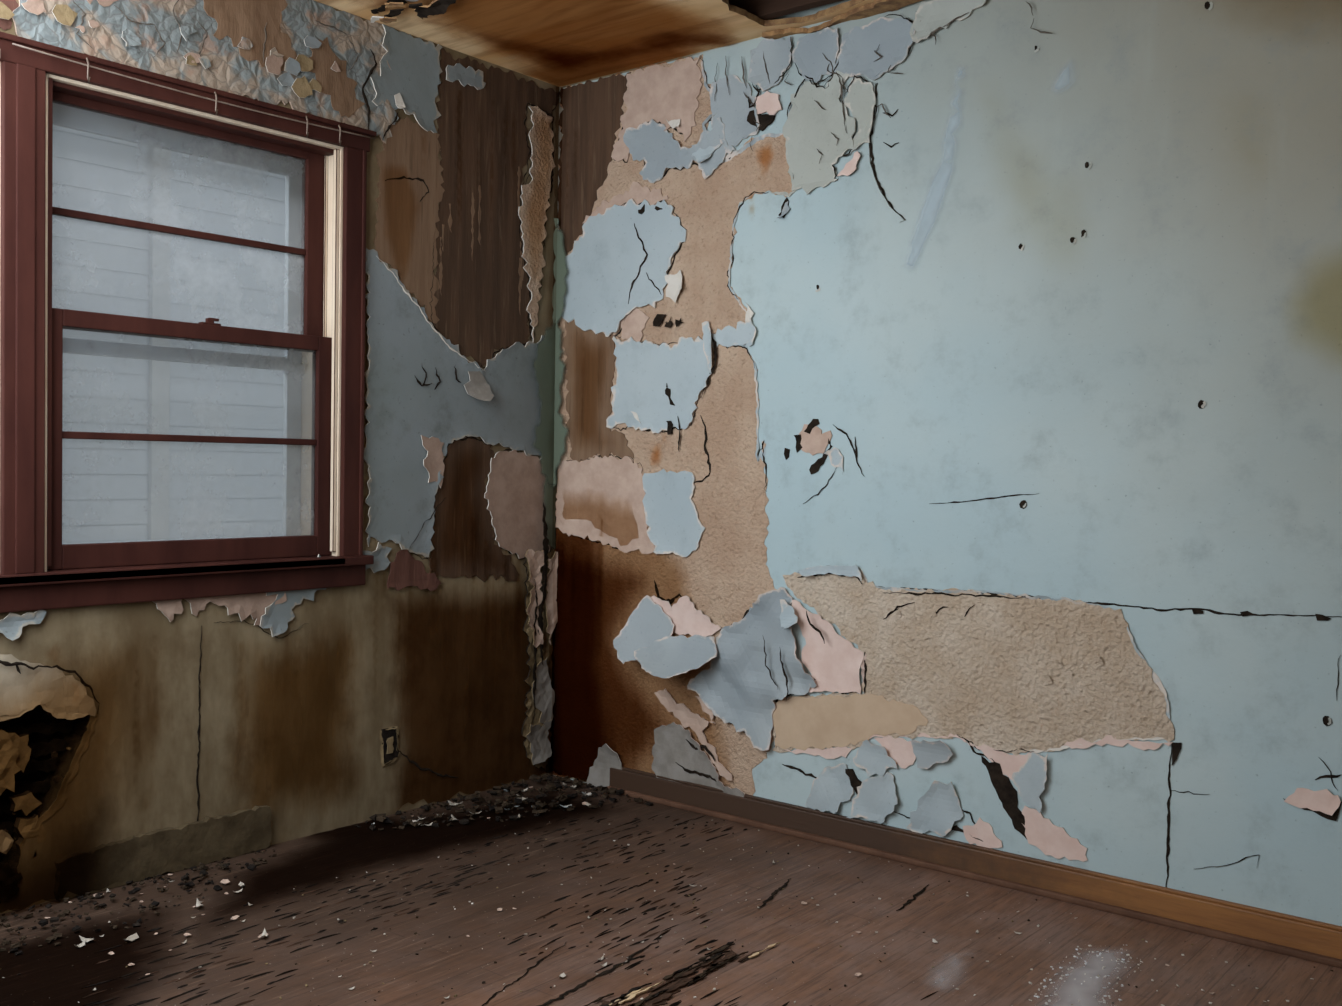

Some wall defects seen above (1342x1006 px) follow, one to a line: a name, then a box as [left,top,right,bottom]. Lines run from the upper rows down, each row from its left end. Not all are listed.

flaking render [362,0,1181,862]
crack [879,586,1342,621]
crack [0,660,100,711]
spalling [0,701,111,919]
crack [1165,744,1259,887]
spalling [1283,759,1342,821]